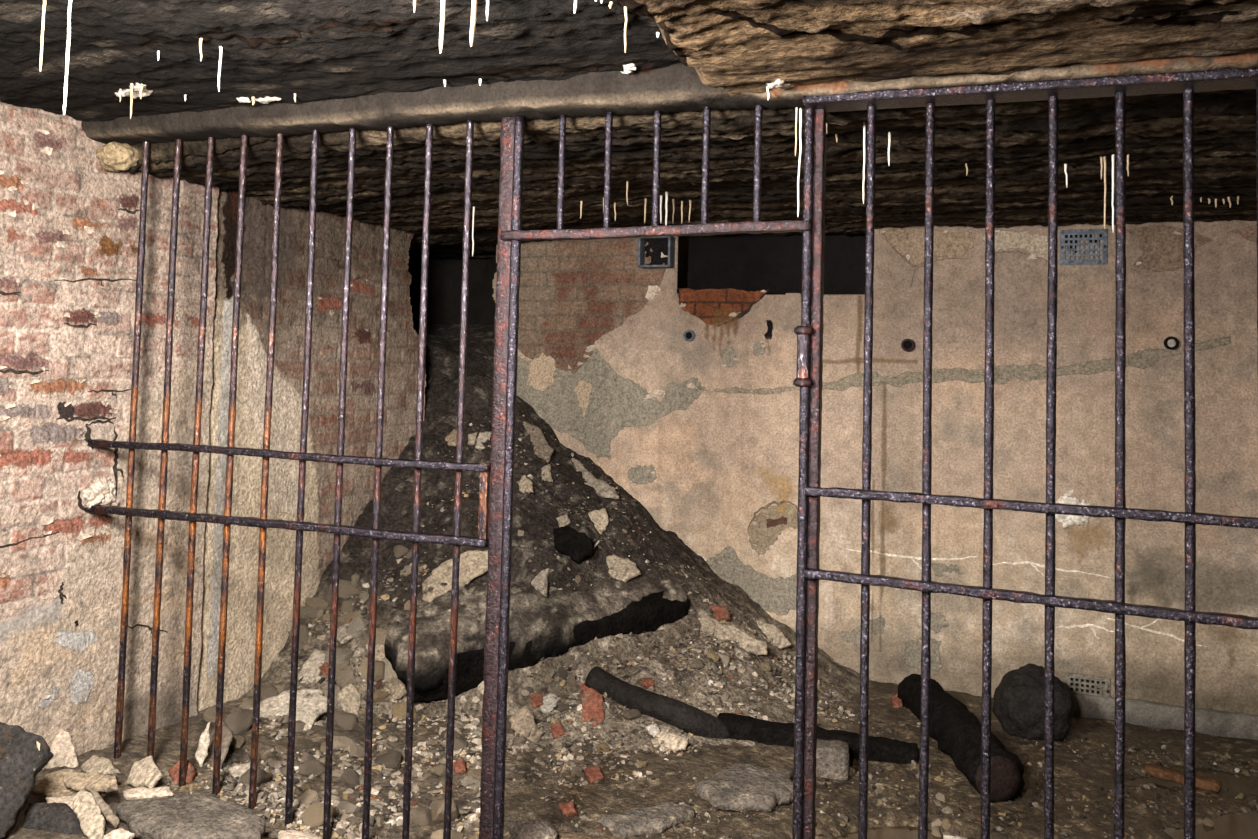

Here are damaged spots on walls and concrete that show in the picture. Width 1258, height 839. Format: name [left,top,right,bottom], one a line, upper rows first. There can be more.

leakage [622,64,636,74]
leakage [115,83,153,99]
spalling [678,288,769,326]
spalling [517,238,705,459]